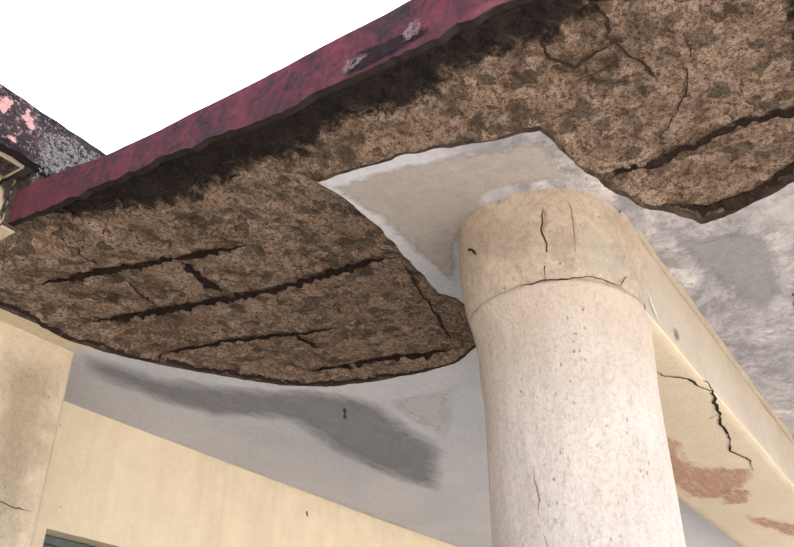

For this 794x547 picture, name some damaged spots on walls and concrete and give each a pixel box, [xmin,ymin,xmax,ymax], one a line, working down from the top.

water stain [785,0,794,40]
water stain [44,0,612,217]
spalling [0,0,794,386]
water stain [341,146,564,275]
crack [520,211,628,294]
water stain [679,235,775,306]
water stain [98,367,432,482]
crack [657,372,753,469]